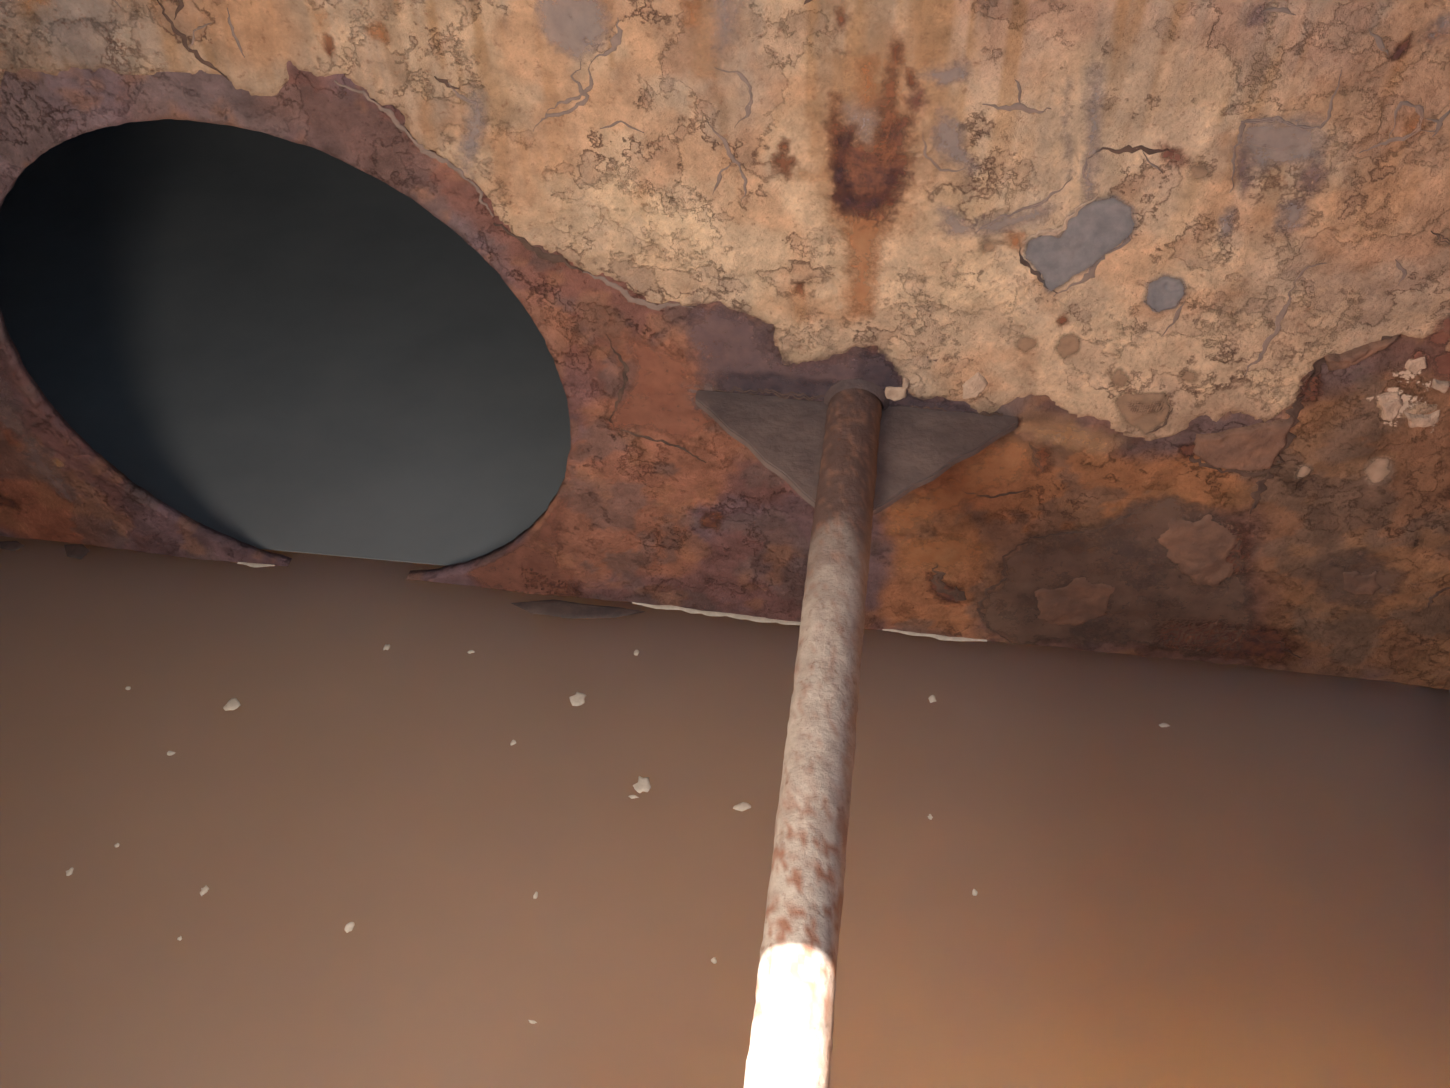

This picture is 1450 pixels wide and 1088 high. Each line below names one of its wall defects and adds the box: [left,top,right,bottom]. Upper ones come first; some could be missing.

crack [157,0,245,81]
crack [434,76,480,126]
crack [533,61,644,133]
crack [707,67,753,202]
rust [773,140,795,177]
rust [827,44,924,314]
peeling [0,0,1450,515]
spalling [927,537,1032,643]
peeling [1034,577,1115,626]
peeling [1157,514,1238,586]